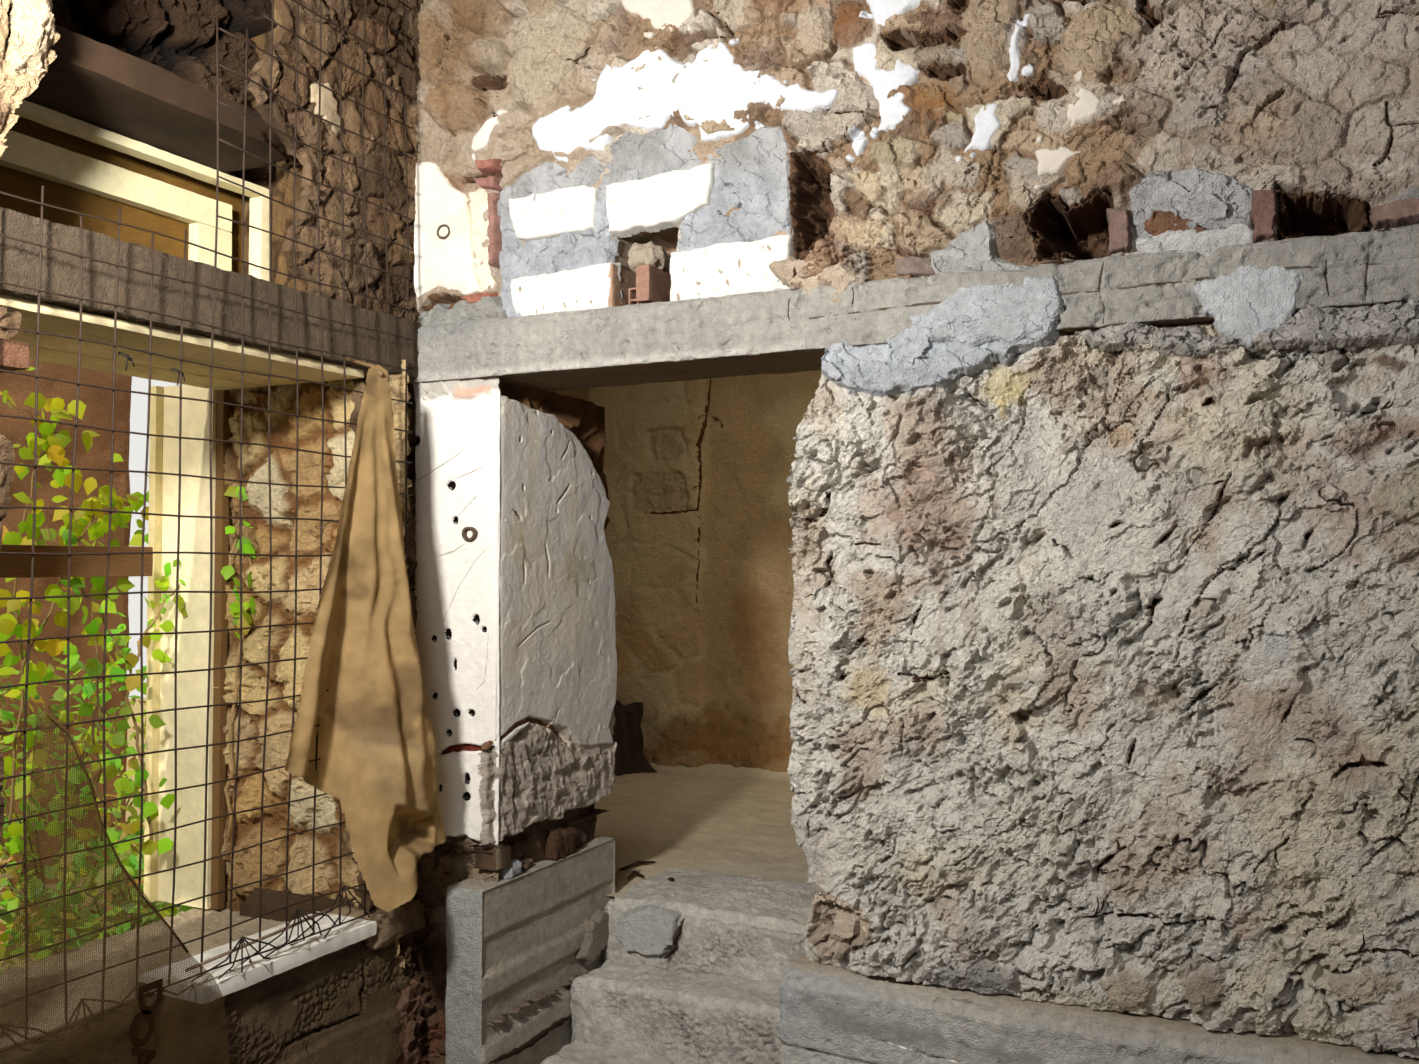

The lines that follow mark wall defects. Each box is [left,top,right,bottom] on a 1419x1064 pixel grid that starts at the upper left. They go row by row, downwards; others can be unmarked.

flaking render [532,0,839,162]
flaking render [846,0,970,163]
flaking render [414,109,508,311]
spalling [788,149,839,279]
spalling [1027,136,1114,262]
crack [804,492,882,598]
crack [1153,474,1232,549]
crack [1142,598,1191,637]
spalling [477,727,615,845]
crack [1333,752,1419,820]
crack [1083,839,1227,925]
crack [866,975,953,989]